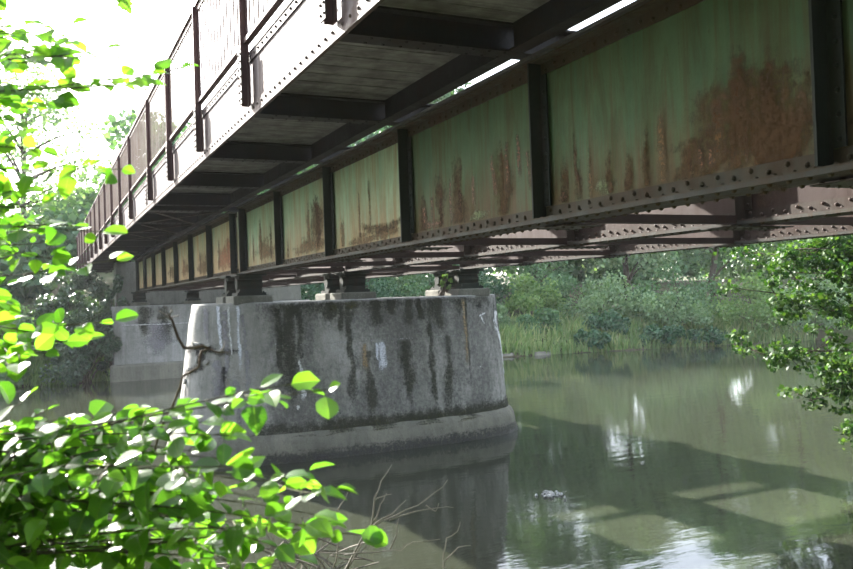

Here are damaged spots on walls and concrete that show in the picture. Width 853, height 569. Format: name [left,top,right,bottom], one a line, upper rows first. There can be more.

corrosion [287,199,324,256]
corrosion [341,181,400,246]
corrosion [421,135,531,231]
water stain [275,304,306,410]
water stain [323,302,387,415]
water stain [371,299,395,326]
water stain [400,340,415,403]
water stain [404,298,454,403]